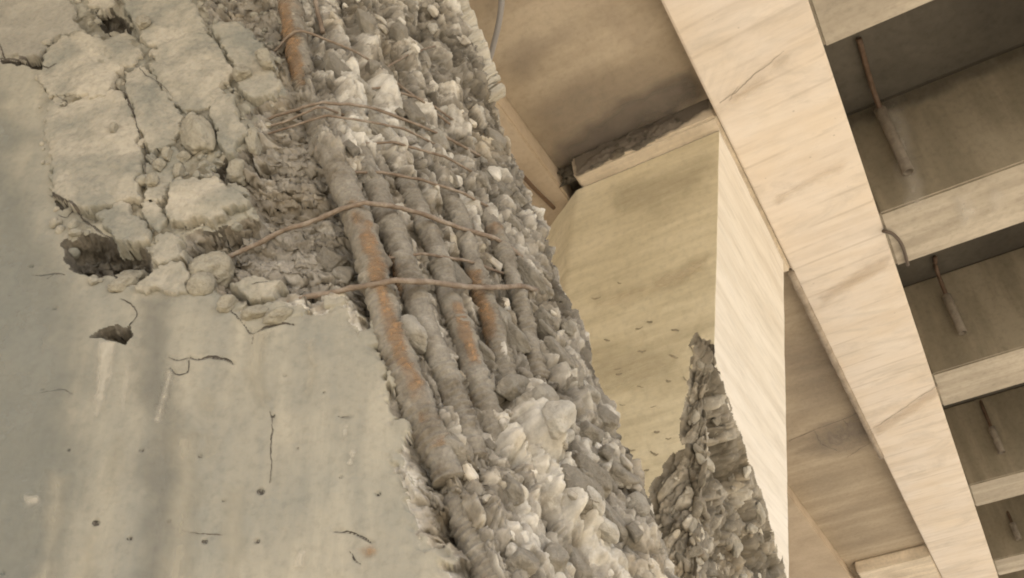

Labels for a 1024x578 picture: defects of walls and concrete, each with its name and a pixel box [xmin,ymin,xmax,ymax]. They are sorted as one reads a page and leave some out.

spalling [0,0,786,578]
crack [169,355,234,375]
crack [267,413,275,480]